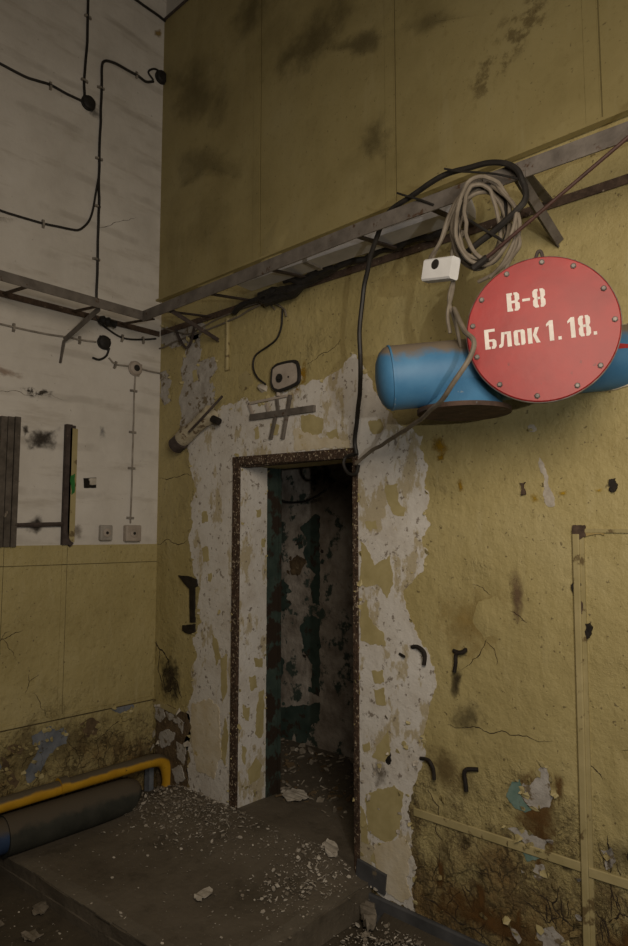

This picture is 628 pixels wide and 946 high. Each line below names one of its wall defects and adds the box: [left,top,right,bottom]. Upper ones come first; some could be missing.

peeling [150,323,437,932]
peeling [0,700,134,790]
peeling [504,761,559,813]
crack [421,789,518,946]
peeling [479,912,582,946]
peeling [501,825,562,908]
crack [524,836,628,946]